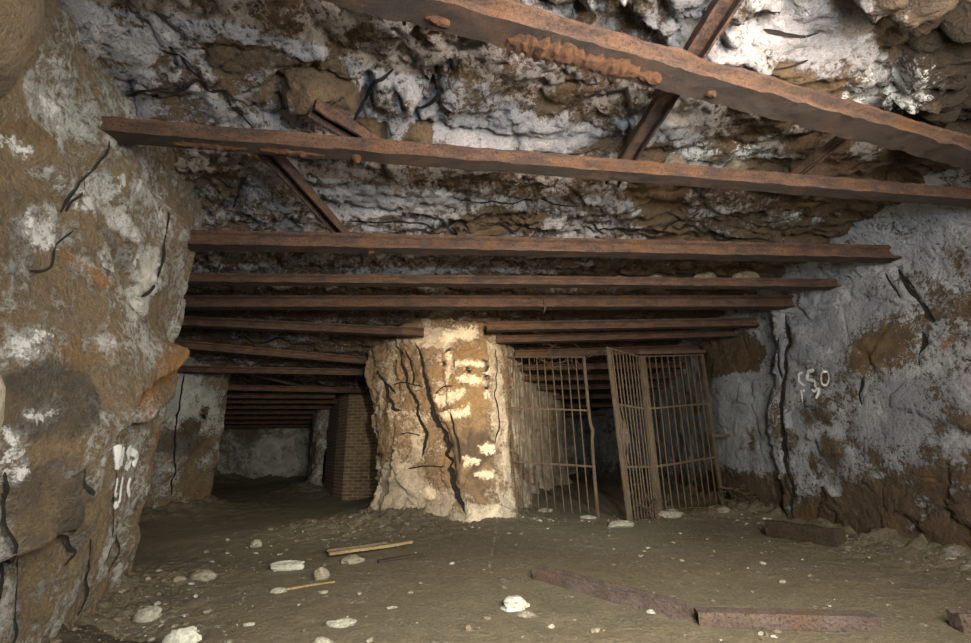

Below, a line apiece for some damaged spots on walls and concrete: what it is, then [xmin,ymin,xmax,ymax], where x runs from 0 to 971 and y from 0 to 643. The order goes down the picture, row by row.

crack [353,69,394,121]
crack [416,86,441,109]
crack [29,141,110,273]
crack [348,196,774,242]
crack [170,375,185,495]
crack [236,331,467,515]
crack [493,350,501,442]
crack [777,315,795,518]
crack [0,472,19,643]
crack [56,468,125,616]